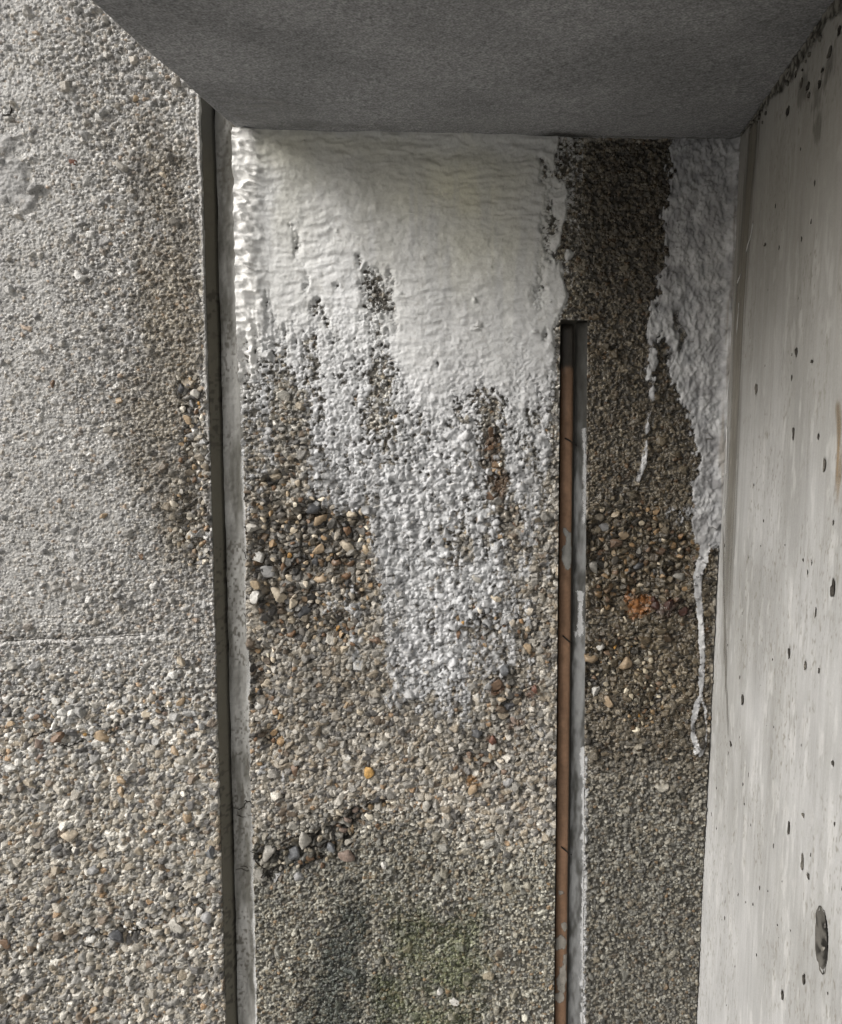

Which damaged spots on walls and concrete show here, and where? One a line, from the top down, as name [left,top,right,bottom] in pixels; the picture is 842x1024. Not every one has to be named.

damp [231,118,757,1024]